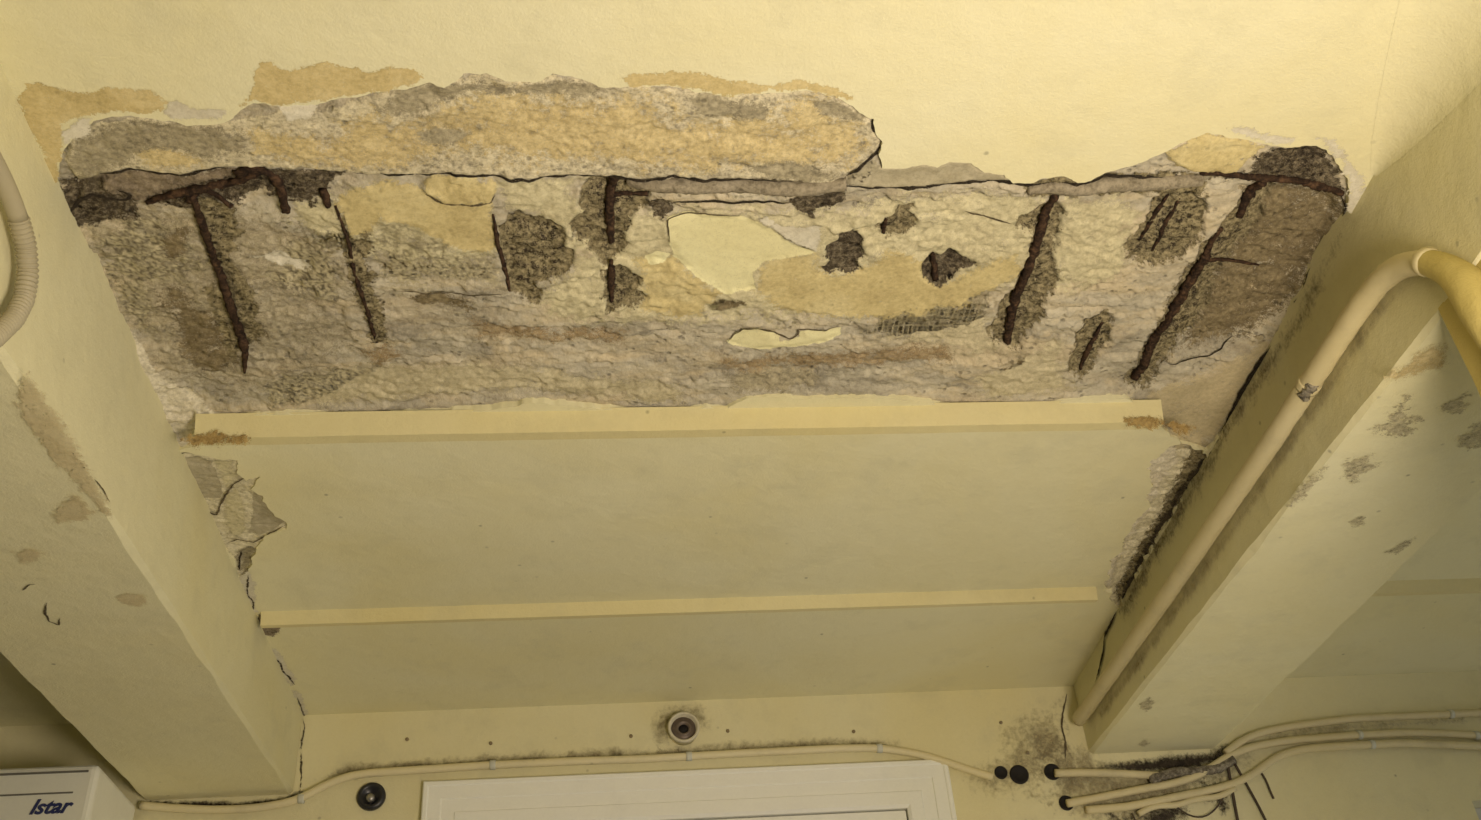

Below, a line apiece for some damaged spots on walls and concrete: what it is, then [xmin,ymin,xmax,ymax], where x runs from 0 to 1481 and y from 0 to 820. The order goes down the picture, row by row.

rust [58,168,347,366]
rust [343,231,406,367]
rust [465,176,674,346]
spalling [6,61,1380,607]
rust [783,192,846,219]
rust [985,146,1344,390]
crack [240,572,258,613]
spalling [258,614,280,637]
crack [272,649,308,787]
leakage [1015,731,1229,820]